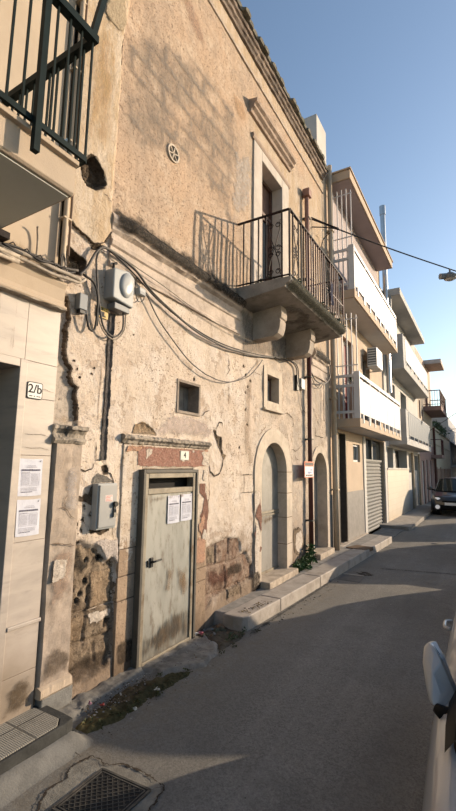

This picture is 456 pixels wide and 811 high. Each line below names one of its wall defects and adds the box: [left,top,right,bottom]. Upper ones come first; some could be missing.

water stain [132,42,251,219]
spalling [81,153,107,190]
water stain [117,210,286,358]
spalling [133,422,157,436]
spalling [214,429,226,459]
spalling [127,445,262,610]
spalling [52,471,119,674]
water stain [47,649,108,682]
water stain [118,639,132,664]